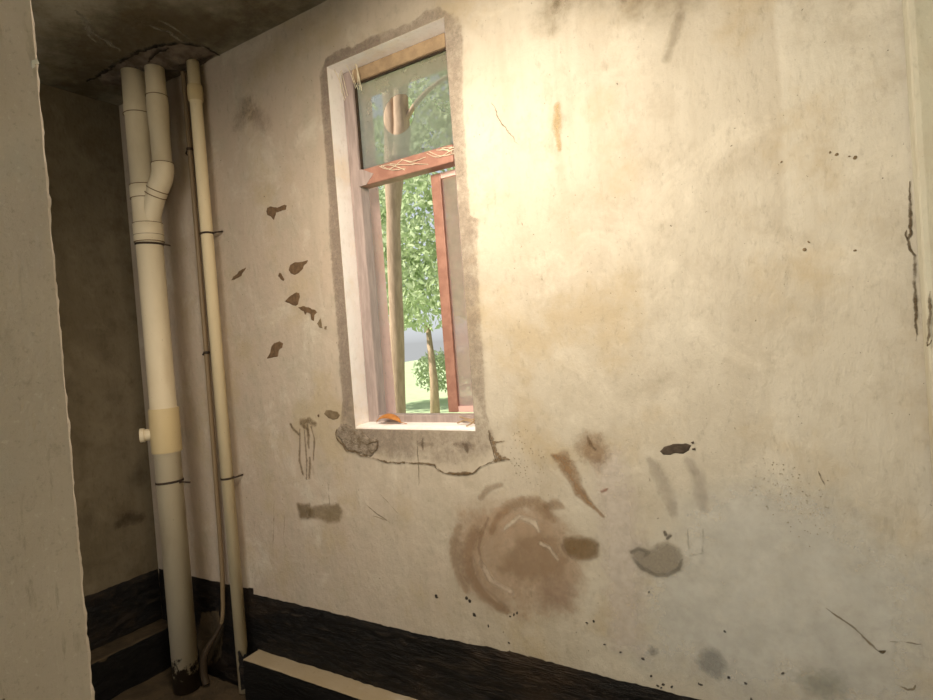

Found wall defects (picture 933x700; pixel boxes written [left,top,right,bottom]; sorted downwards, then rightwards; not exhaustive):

crack [74,10,220,82]
spalling [266,205,287,220]
spalling [278,260,308,281]
crack [905,181,932,346]
spalling [285,292,327,329]
spalling [267,341,283,359]
water stain [290,418,316,479]
spalling [488,431,510,463]
spalling [660,441,696,455]
water stain [510,429,604,517]
water stain [564,538,598,559]
crack [826,608,915,654]